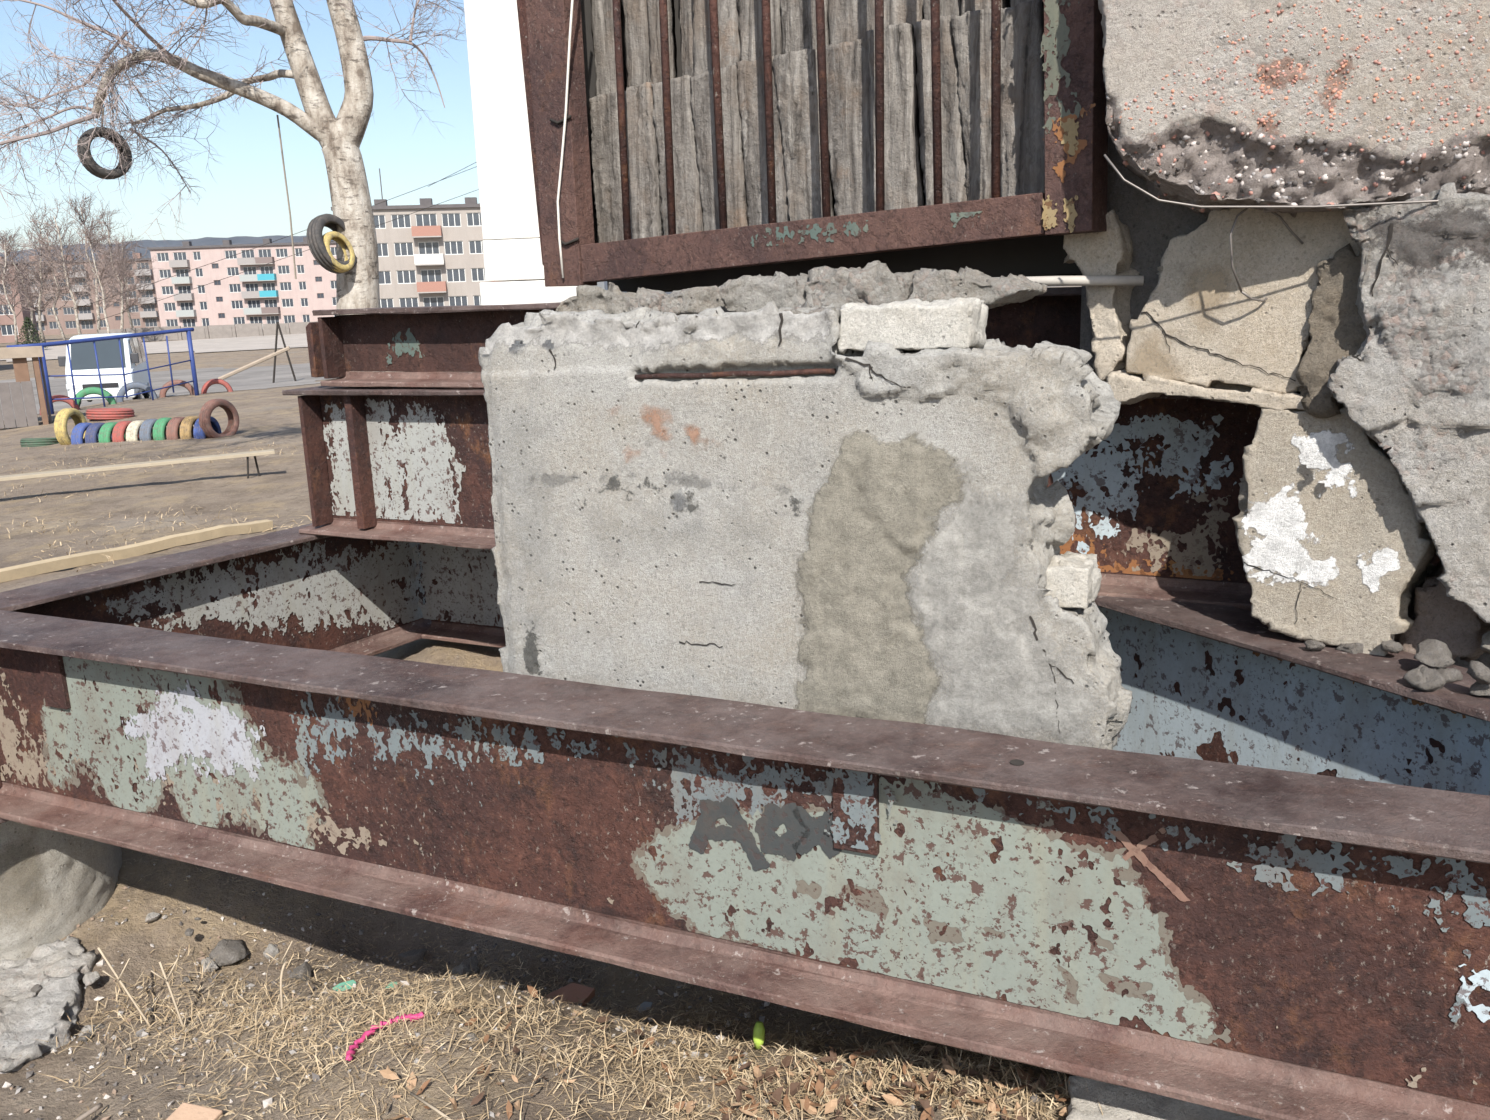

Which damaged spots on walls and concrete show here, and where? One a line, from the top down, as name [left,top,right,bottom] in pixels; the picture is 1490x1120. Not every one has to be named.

corrosion [1041,103,1096,233]
spalling [482,301,832,354]
crack [1141,311,1296,381]
peeling [85,540,504,638]
peeling [323,401,356,516]
peeling [365,398,466,524]
corrosion [1059,532,1234,581]
peeling [1051,413,1357,588]
peeling [1097,605,1490,796]
peeling [0,656,1235,1046]
peeling [1149,814,1490,932]
peeling [1433,949,1490,1023]